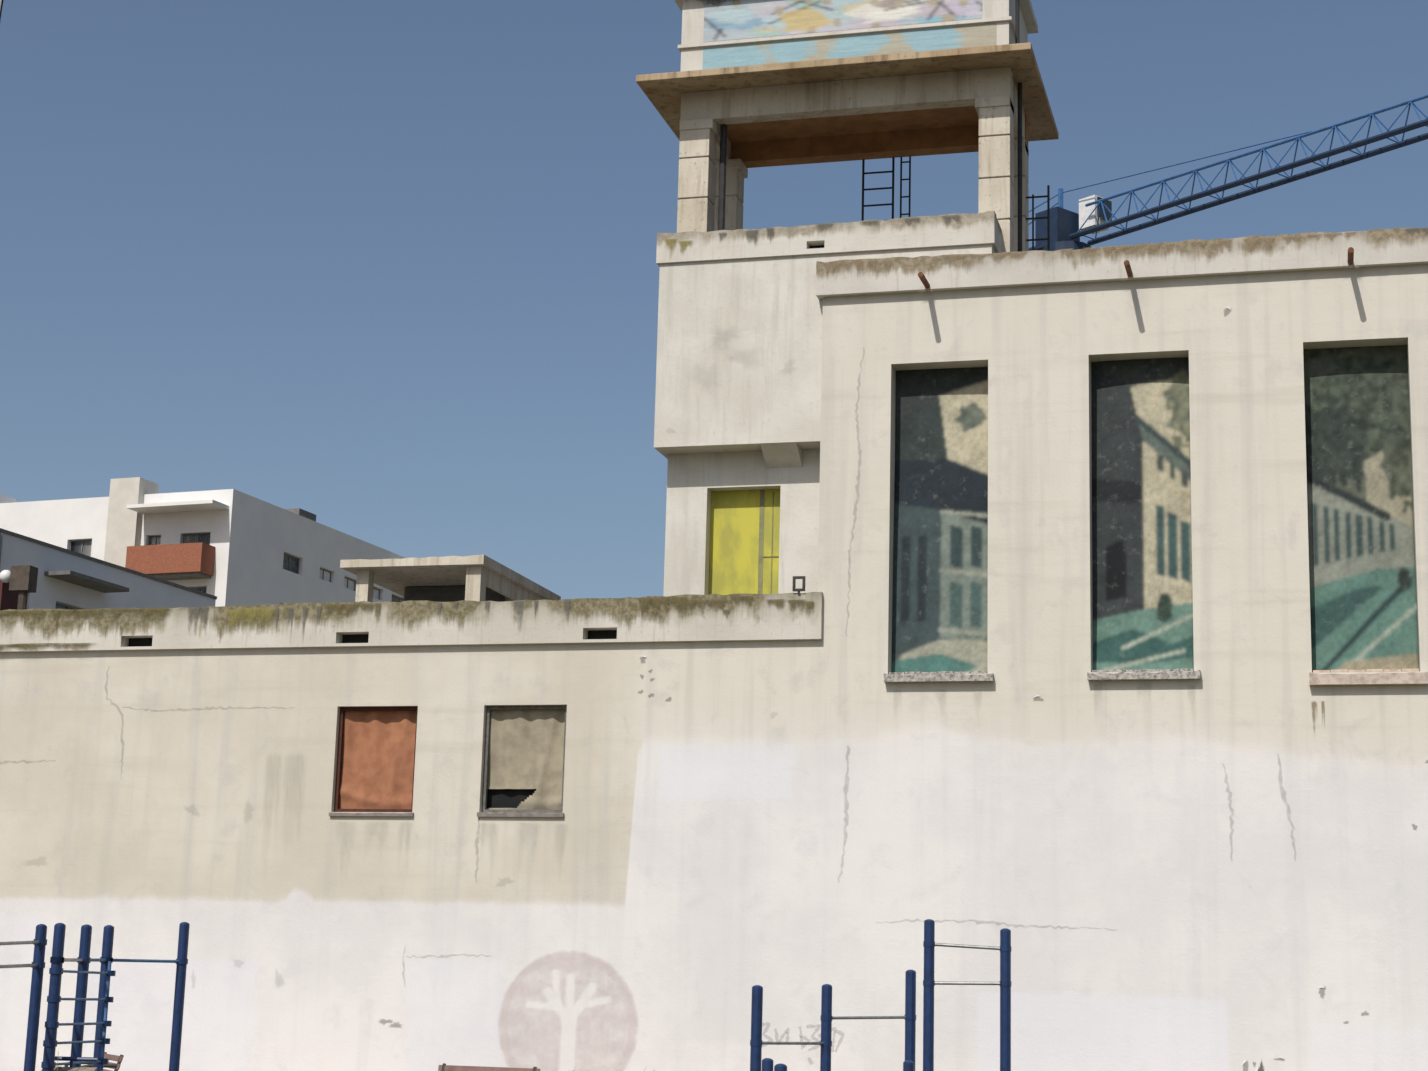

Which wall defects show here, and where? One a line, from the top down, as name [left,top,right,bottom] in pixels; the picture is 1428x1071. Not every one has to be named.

leakage [189,607,208,624]
leakage [241,606,321,630]
leakage [344,603,381,616]
leakage [653,597,729,614]
leakage [768,599,814,610]